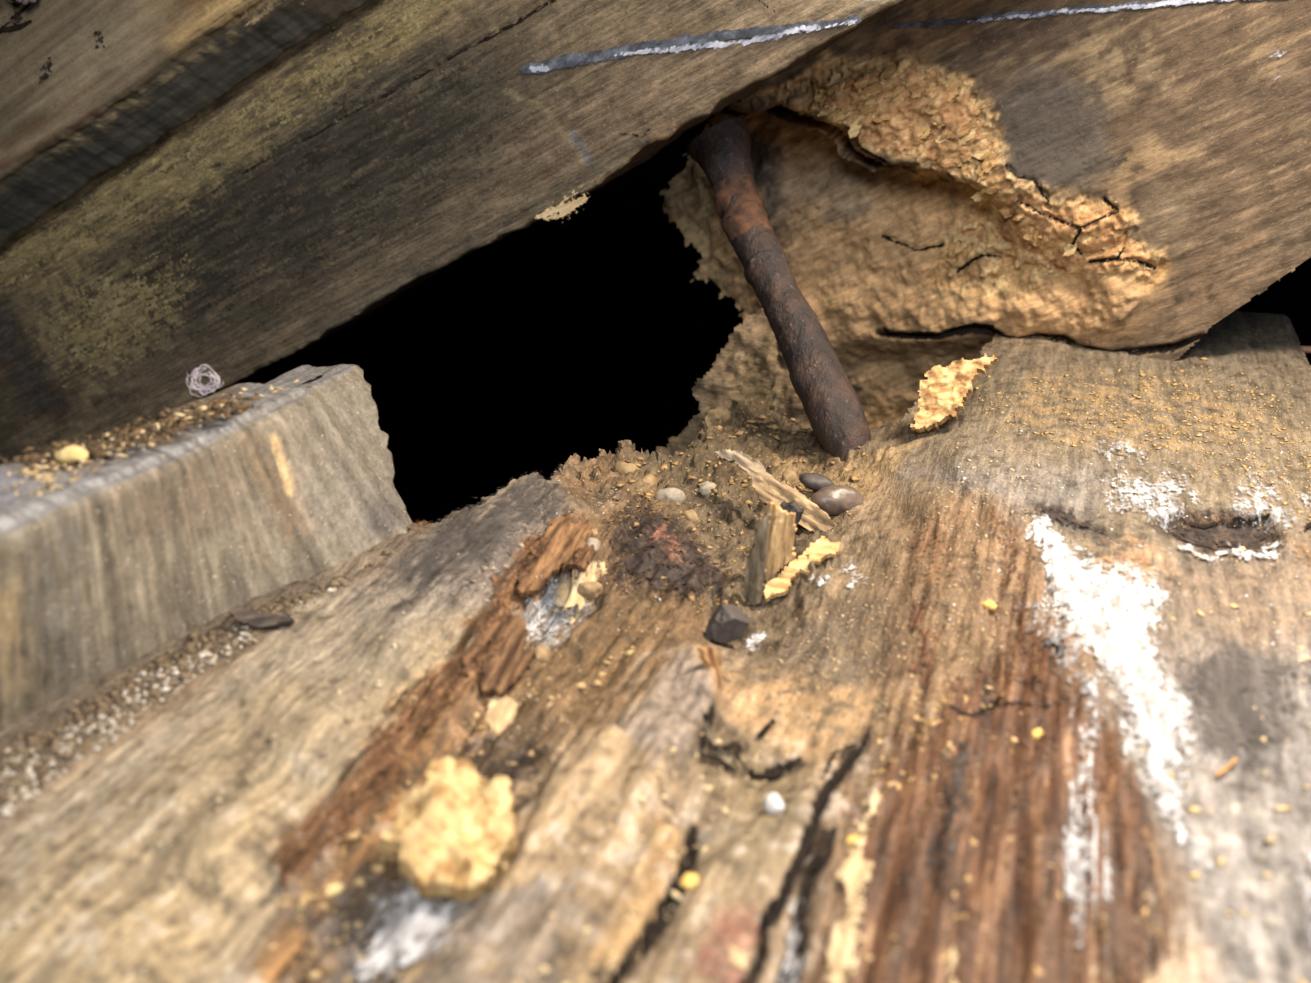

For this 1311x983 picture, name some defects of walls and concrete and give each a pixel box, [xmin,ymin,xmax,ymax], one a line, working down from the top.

crack [882,235,1001,273]
crack [1005,163,1157,269]
damp [1093,440,1200,529]
damp [1170,474,1296,565]
damp [1004,513,1311,983]
crack [700,704,871,983]
crack [591,825,698,983]